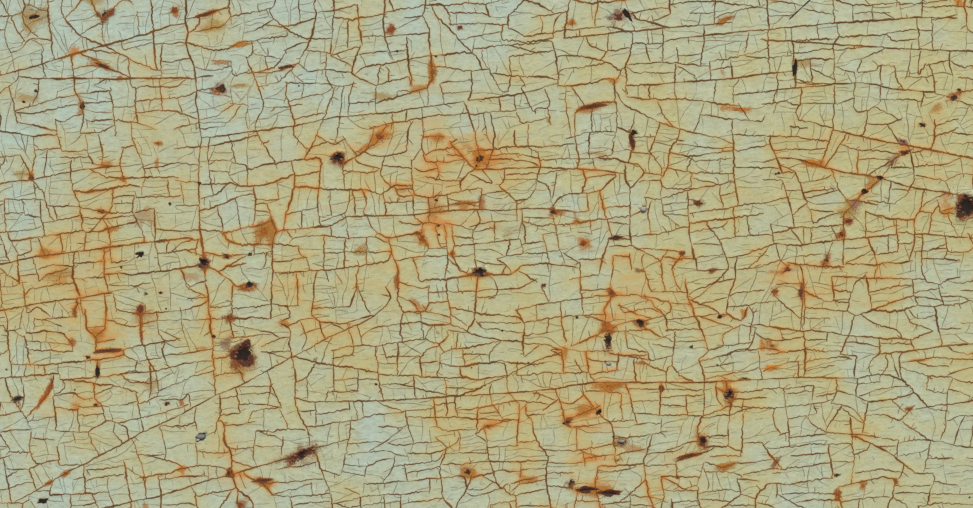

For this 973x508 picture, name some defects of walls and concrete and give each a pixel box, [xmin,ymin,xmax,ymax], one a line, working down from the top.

crack [560,91,571,134]
rust [248,218,278,256]
crack [111,282,151,293]
rust [568,479,611,497]